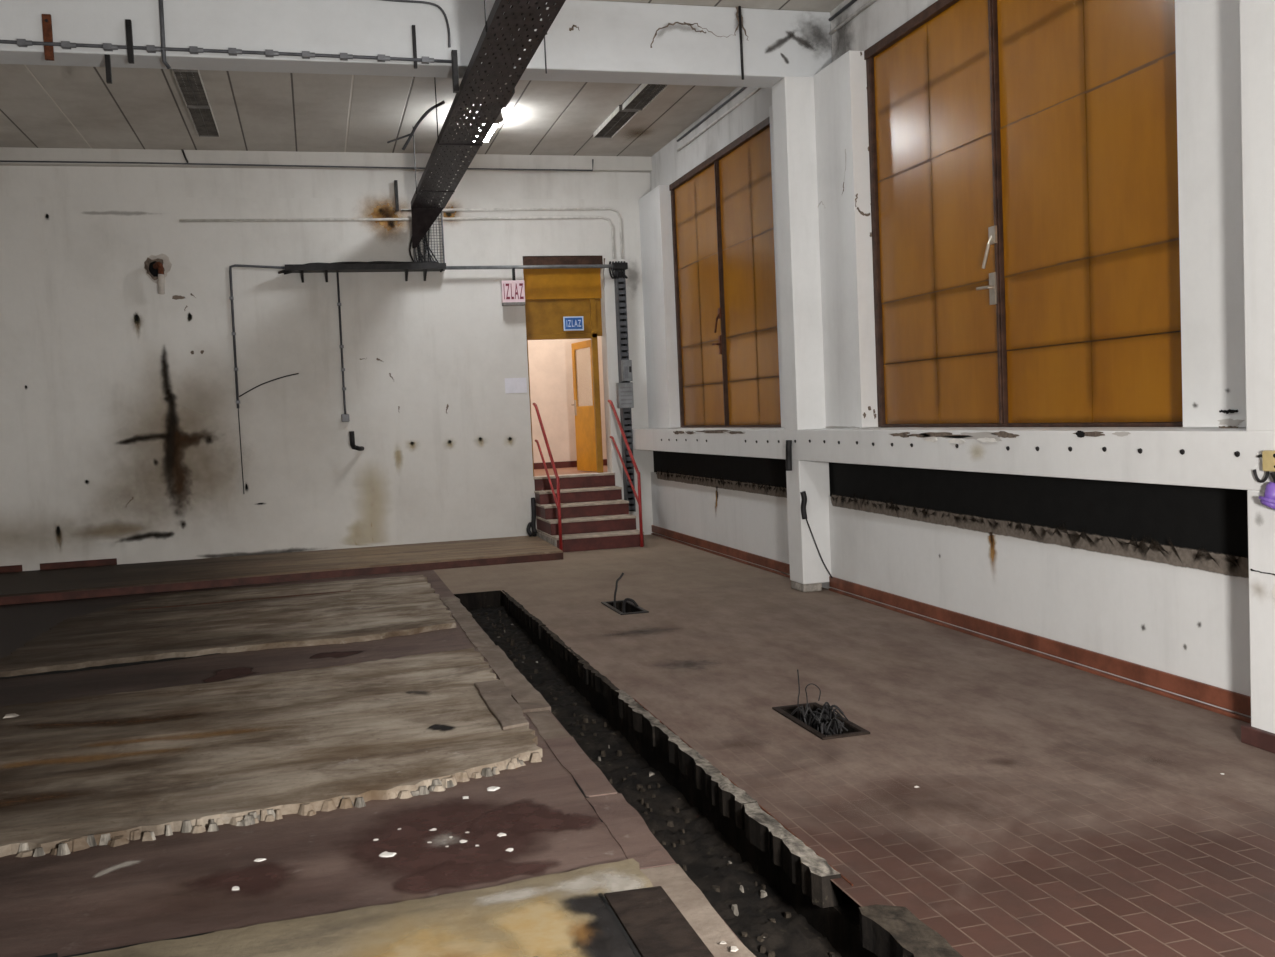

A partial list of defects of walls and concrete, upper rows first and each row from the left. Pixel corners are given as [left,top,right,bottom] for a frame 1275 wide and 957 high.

rust [368,201,403,233]
water stain [119,350,211,507]
spalling [890,431,1019,444]
water stain [89,522,185,541]
water stain [564,875,638,892]